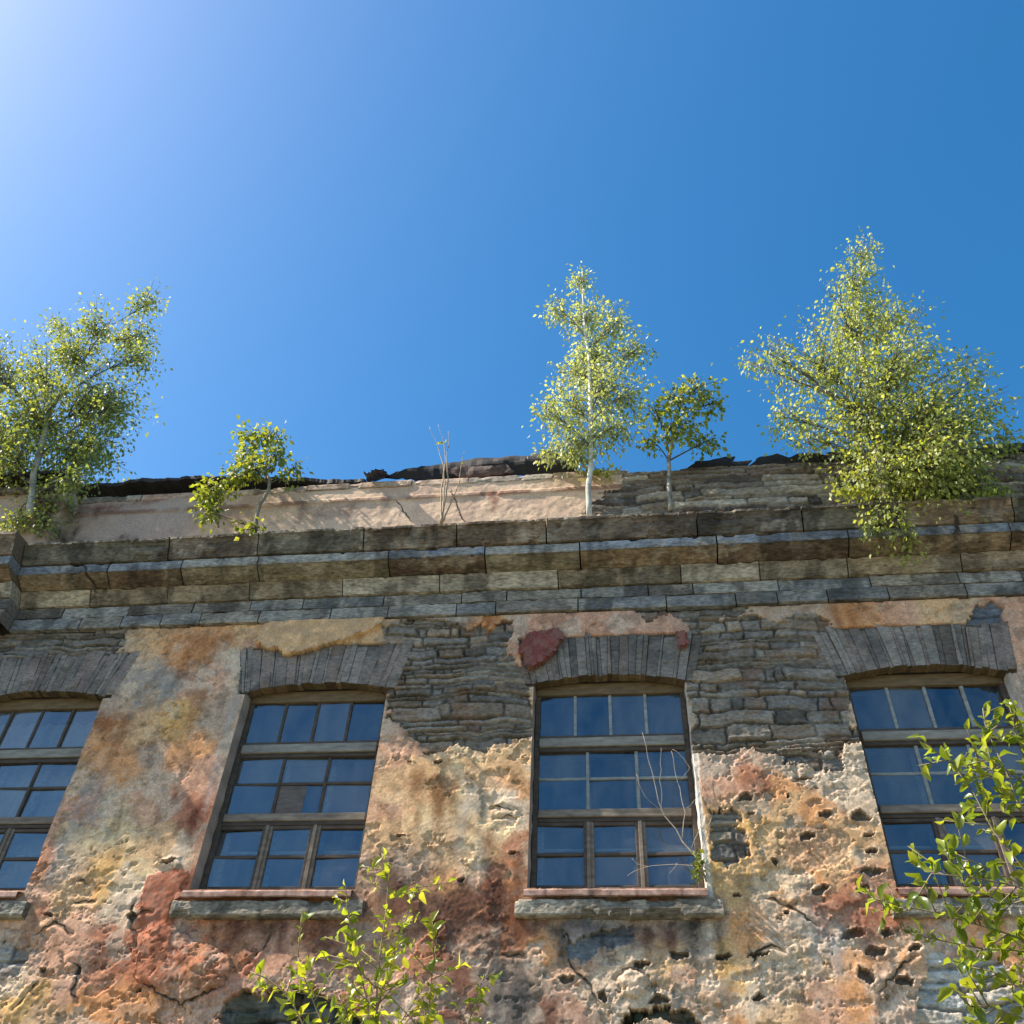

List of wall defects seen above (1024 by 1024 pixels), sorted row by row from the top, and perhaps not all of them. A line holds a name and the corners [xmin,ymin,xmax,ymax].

flaking render [253,615,565,765]
flaking render [636,607,860,781]
flaking render [709,791,755,869]
hole [799,831,816,841]
hole [851,809,887,894]
crack [129,901,151,945]
flaking render [126,857,189,932]
hole [715,951,732,961]
hole [811,883,830,896]
hole [841,927,894,985]